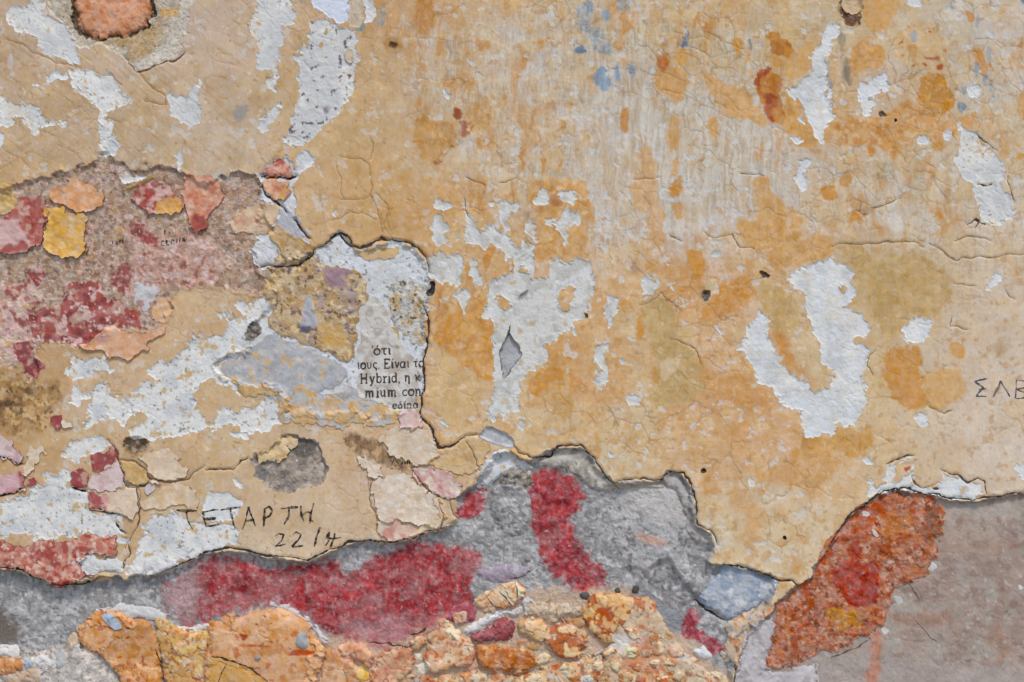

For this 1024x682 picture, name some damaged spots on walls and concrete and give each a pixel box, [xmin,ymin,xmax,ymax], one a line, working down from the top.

peeling [282,0,377,148]
peeling [786,21,840,145]
peeling [916,134,930,145]
peeling [943,121,1017,226]
crack [831,218,1023,286]
flaking render [0,68,871,682]
flaking render [865,456,1024,682]